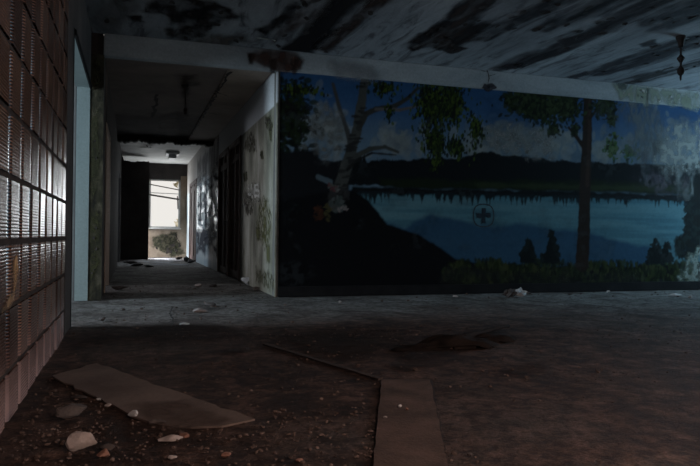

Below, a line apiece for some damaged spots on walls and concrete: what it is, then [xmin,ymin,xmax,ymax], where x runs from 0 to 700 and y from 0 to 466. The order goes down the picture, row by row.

damp [103,0,247,45]
damp [484,0,674,71]
damp [569,35,700,79]
damp [256,196,271,262]